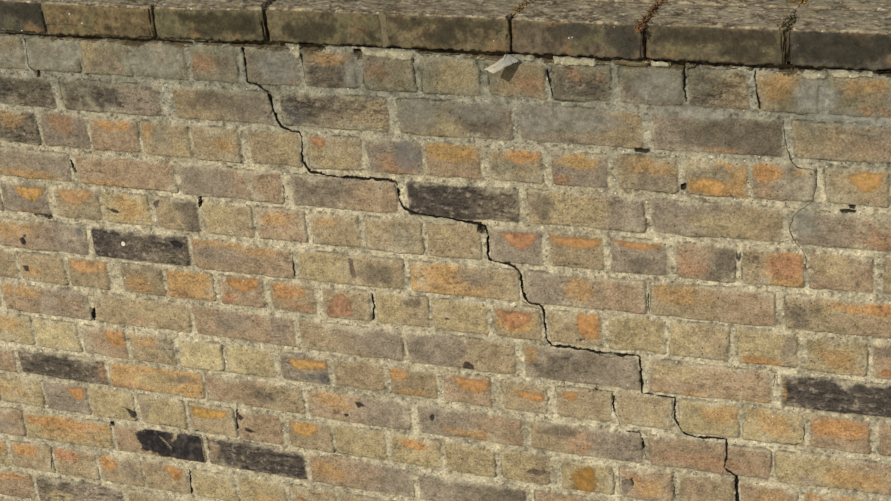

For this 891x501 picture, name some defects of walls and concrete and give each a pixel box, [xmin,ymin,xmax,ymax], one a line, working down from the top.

crack [241,42,739,501]
crack [783,125,817,272]